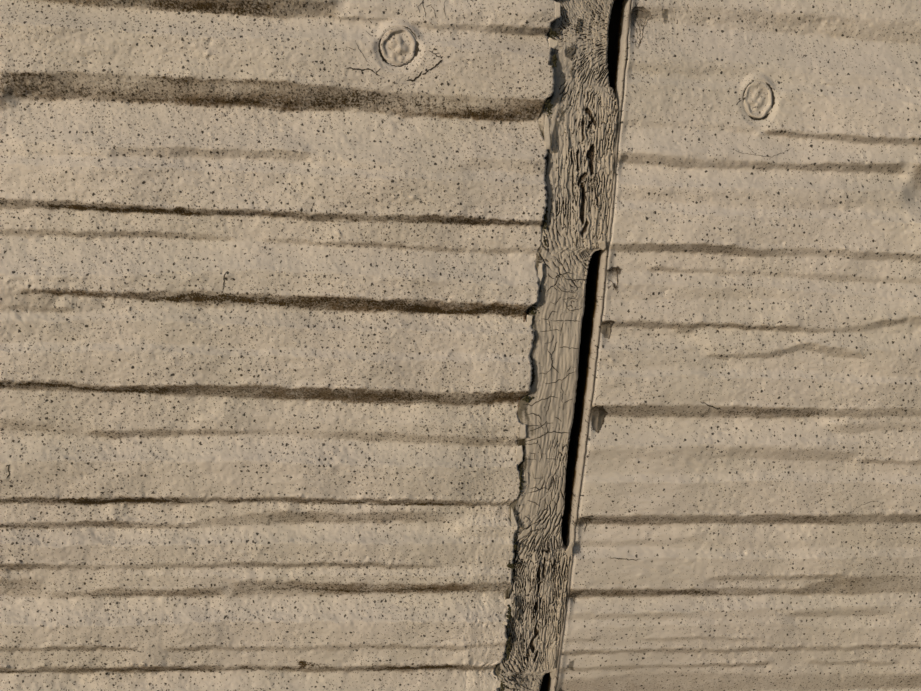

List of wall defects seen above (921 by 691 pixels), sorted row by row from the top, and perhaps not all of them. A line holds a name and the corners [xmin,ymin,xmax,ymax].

crack [499,0,618,691]